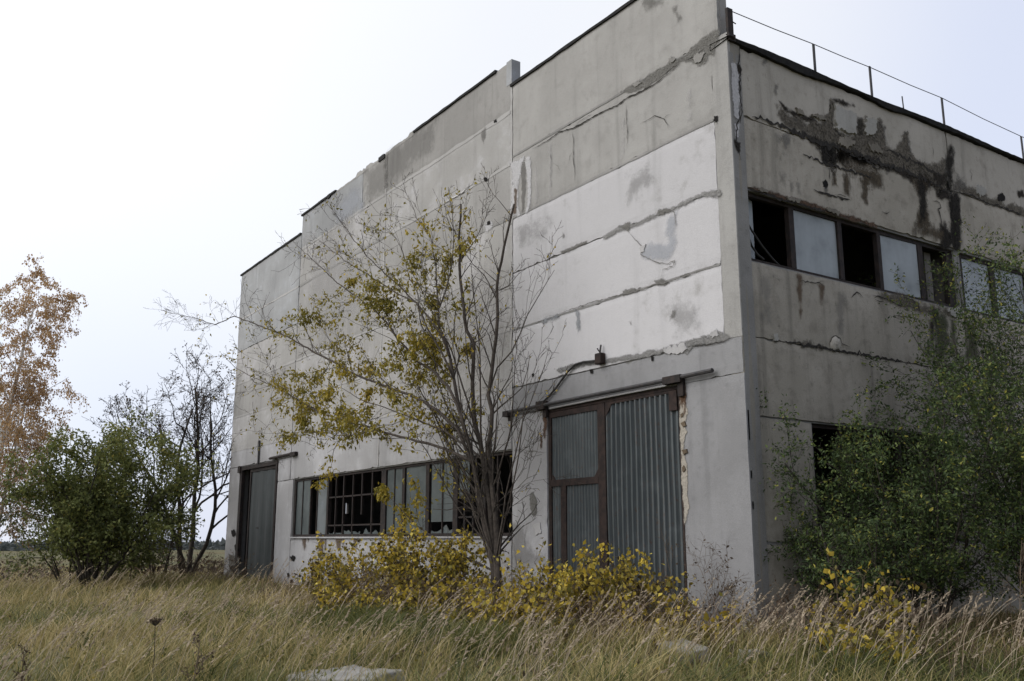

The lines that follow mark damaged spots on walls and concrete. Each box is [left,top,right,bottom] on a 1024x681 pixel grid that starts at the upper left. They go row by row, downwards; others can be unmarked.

spalling [624,29,719,93]
crack [533,50,702,187]
peeling [510,156,531,217]
damp [829,150,883,204]
damp [912,146,964,251]
peeling [618,209,689,286]
peeling [557,330,732,374]
spalling [679,400,689,523]